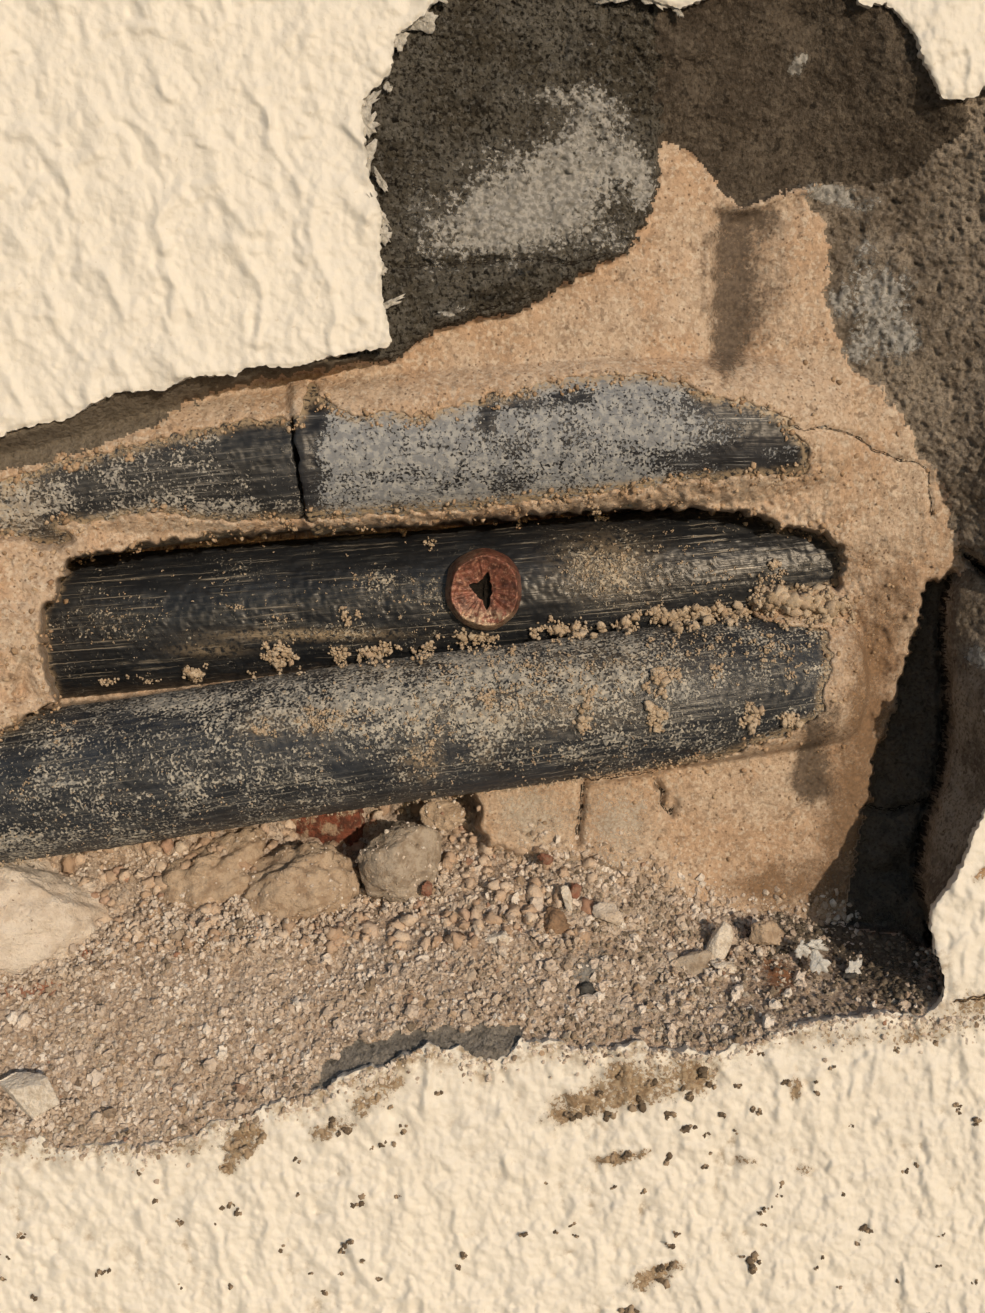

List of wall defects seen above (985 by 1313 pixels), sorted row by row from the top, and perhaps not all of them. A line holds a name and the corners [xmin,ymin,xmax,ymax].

spalling [0,0,985,993]
spalling [0,830,943,1148]
peeling [224,1140,254,1160]